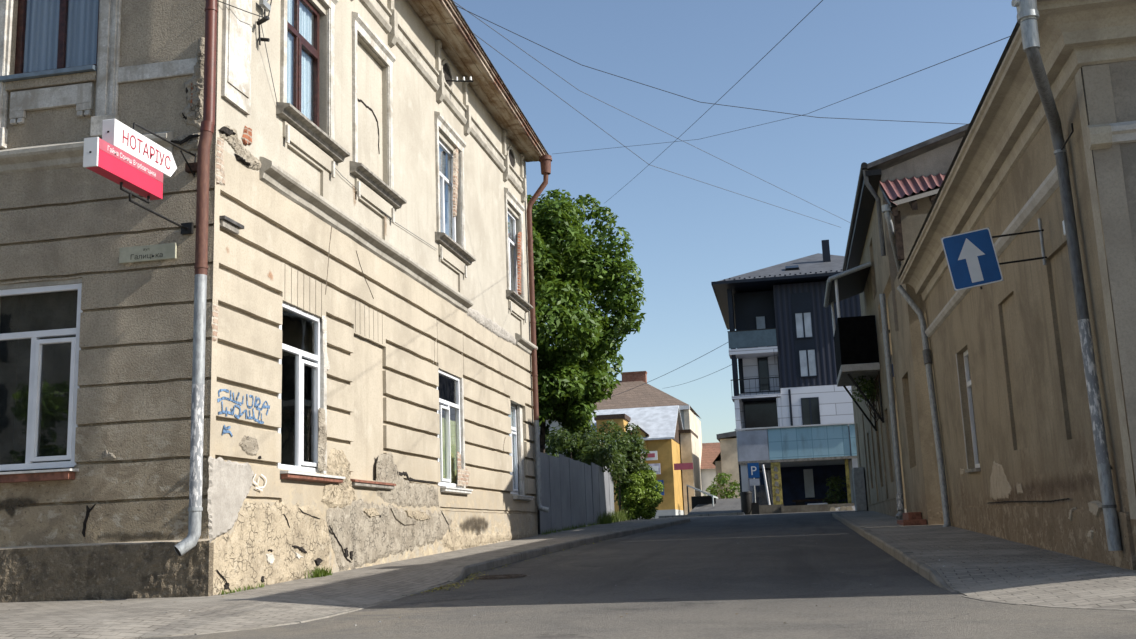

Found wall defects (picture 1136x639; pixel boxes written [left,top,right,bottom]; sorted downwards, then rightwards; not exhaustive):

spalling [179,37,205,130]
spalling [216,126,261,185]
spalling [322,315,330,371]
spalling [318,408,328,471]
spalling [208,452,533,595]